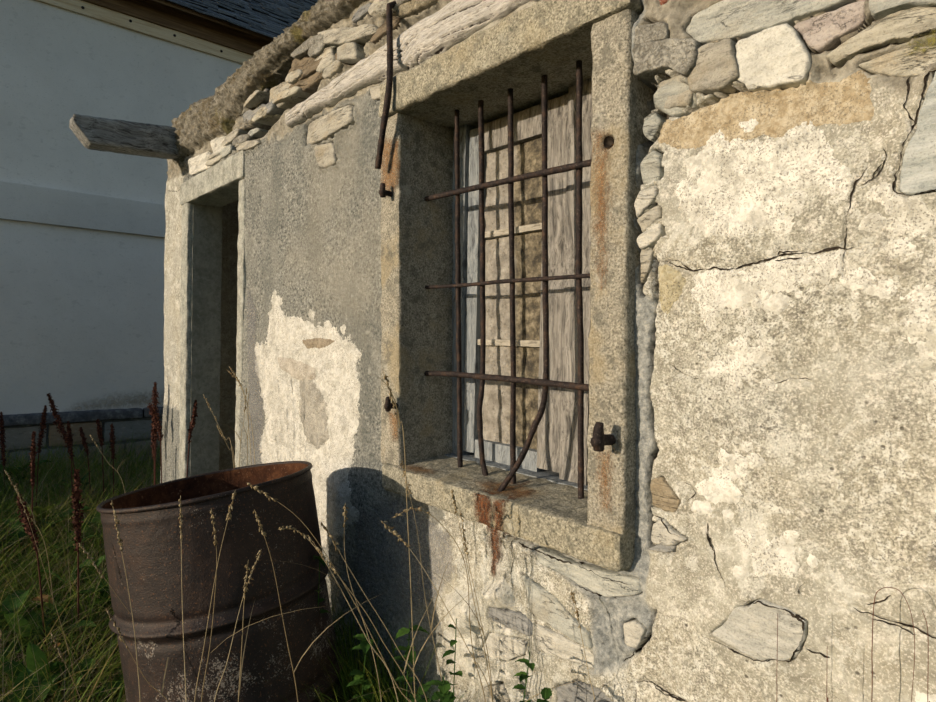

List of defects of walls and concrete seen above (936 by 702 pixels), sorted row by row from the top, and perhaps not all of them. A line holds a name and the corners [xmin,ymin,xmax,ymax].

rust [381,141,401,191]
crack [669,70,936,276]
flaking render [254,289,362,548]
rust [474,479,543,576]